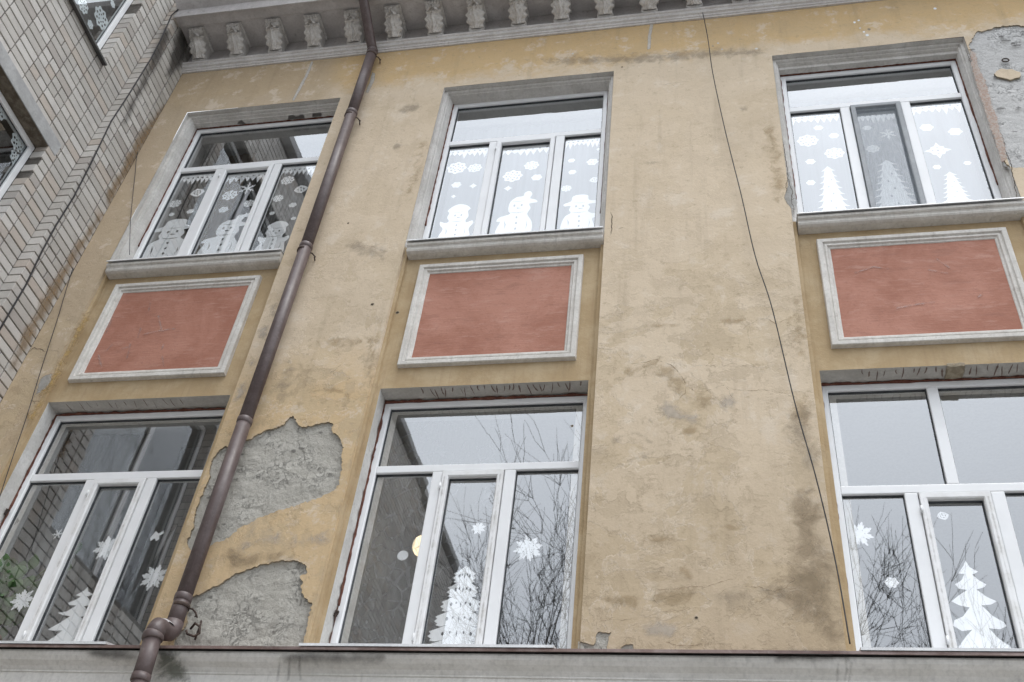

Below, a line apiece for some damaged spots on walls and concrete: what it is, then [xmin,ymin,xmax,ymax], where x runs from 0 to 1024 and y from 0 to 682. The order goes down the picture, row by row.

spalling [967,25,1024,169]
spalling [187,446,228,550]
spalling [210,416,344,546]
spalling [174,560,312,646]